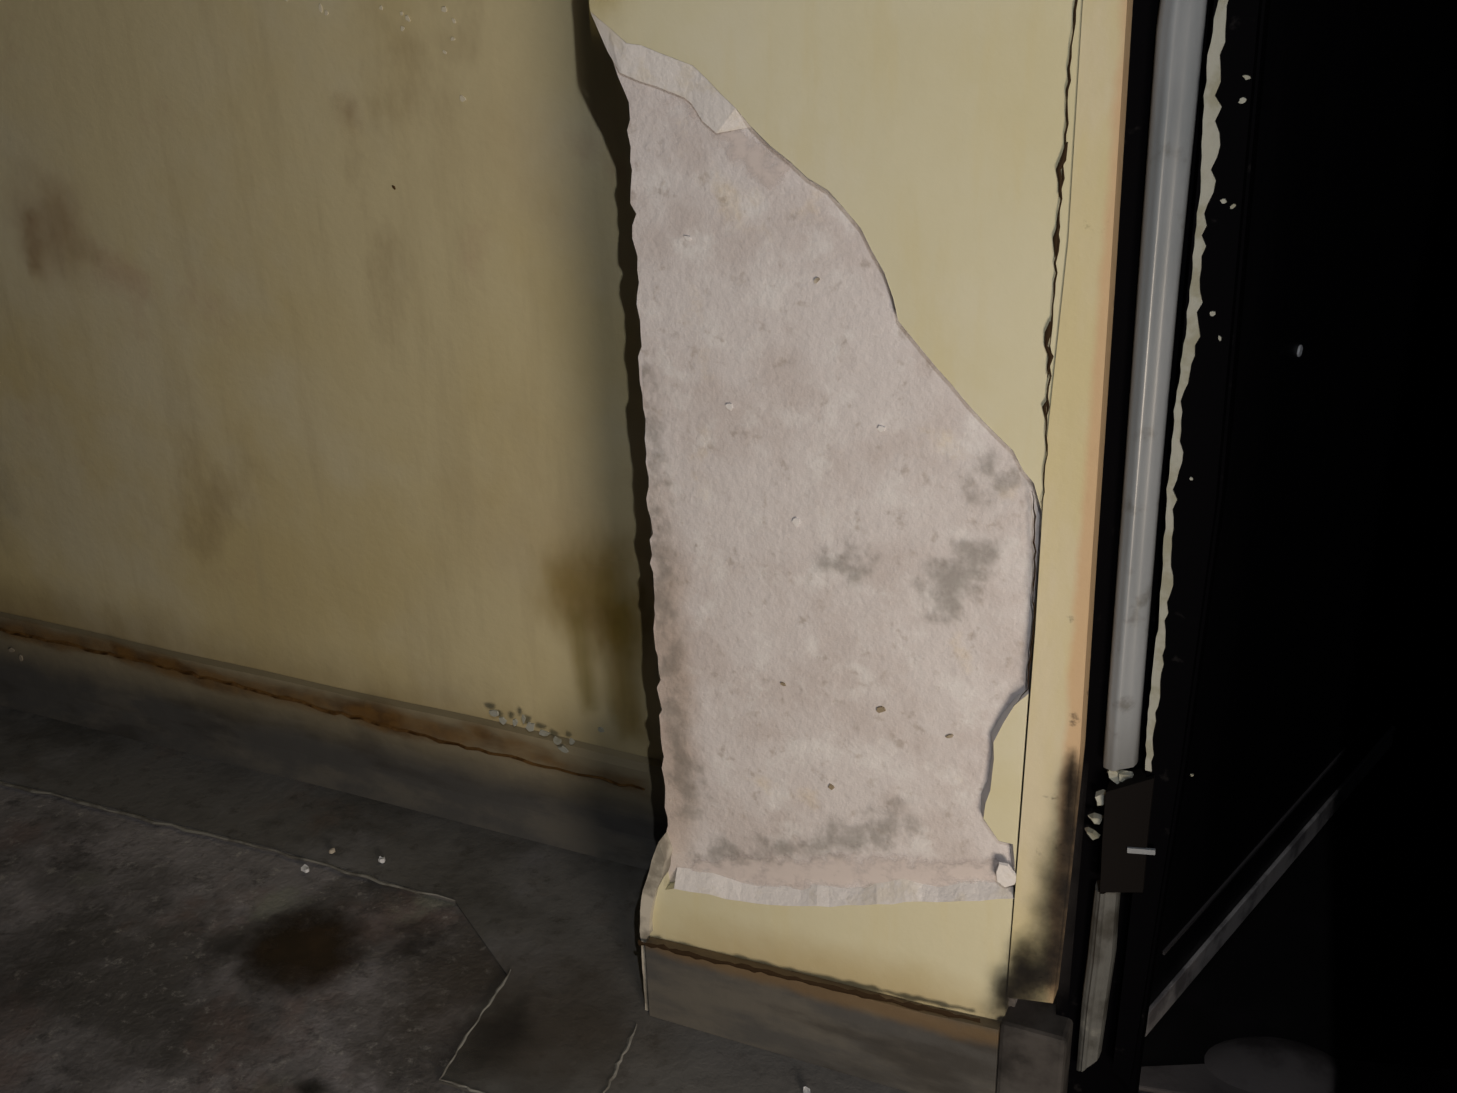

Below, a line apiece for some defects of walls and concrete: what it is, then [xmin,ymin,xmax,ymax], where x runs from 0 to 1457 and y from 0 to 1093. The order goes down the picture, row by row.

flaking render [591,13,1042,907]
crack [1019,0,1078,700]
leakage [995,760,1081,1022]